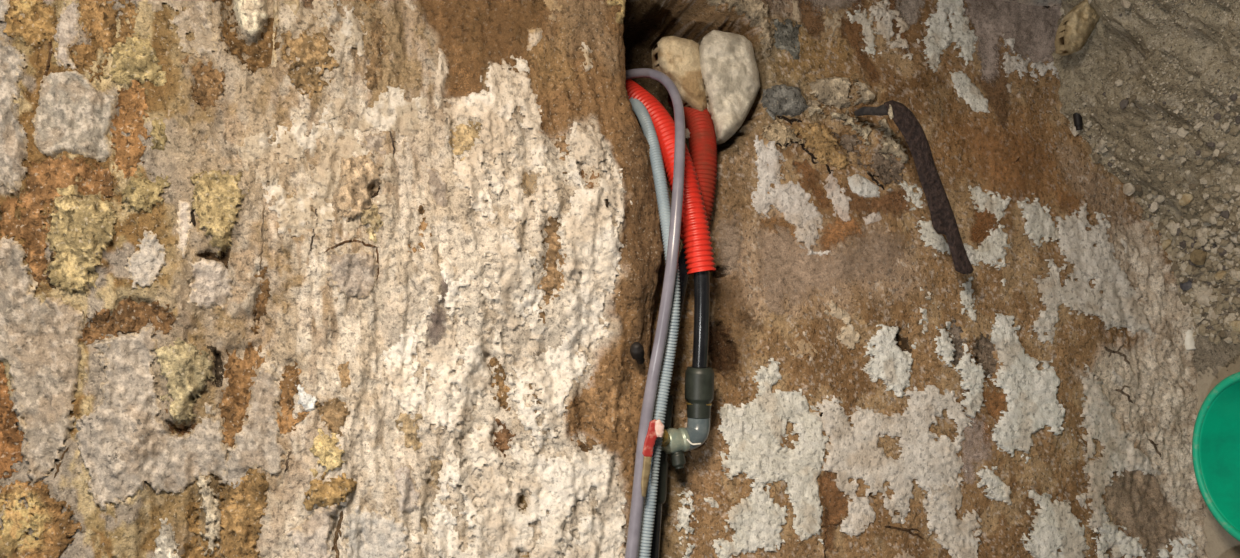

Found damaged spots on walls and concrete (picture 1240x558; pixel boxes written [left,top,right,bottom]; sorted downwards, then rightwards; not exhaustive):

spalling [807,76,912,185]
spalling [950,318,998,379]